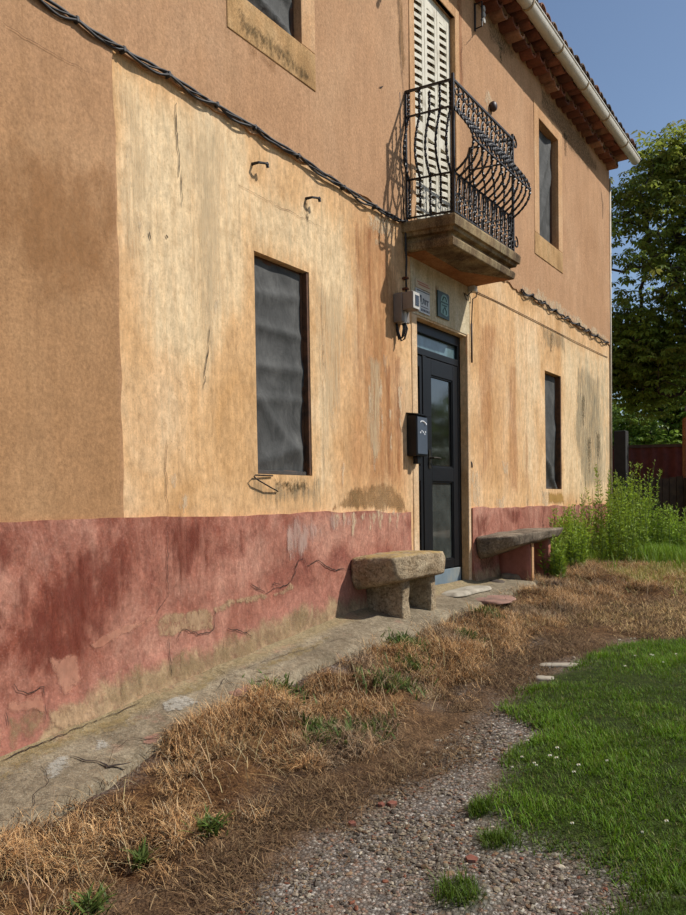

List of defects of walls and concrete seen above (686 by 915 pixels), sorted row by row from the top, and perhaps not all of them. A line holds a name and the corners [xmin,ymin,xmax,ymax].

damp [333,484,405,513]
crack [253,558,351,594]
spalling [92,594,265,648]